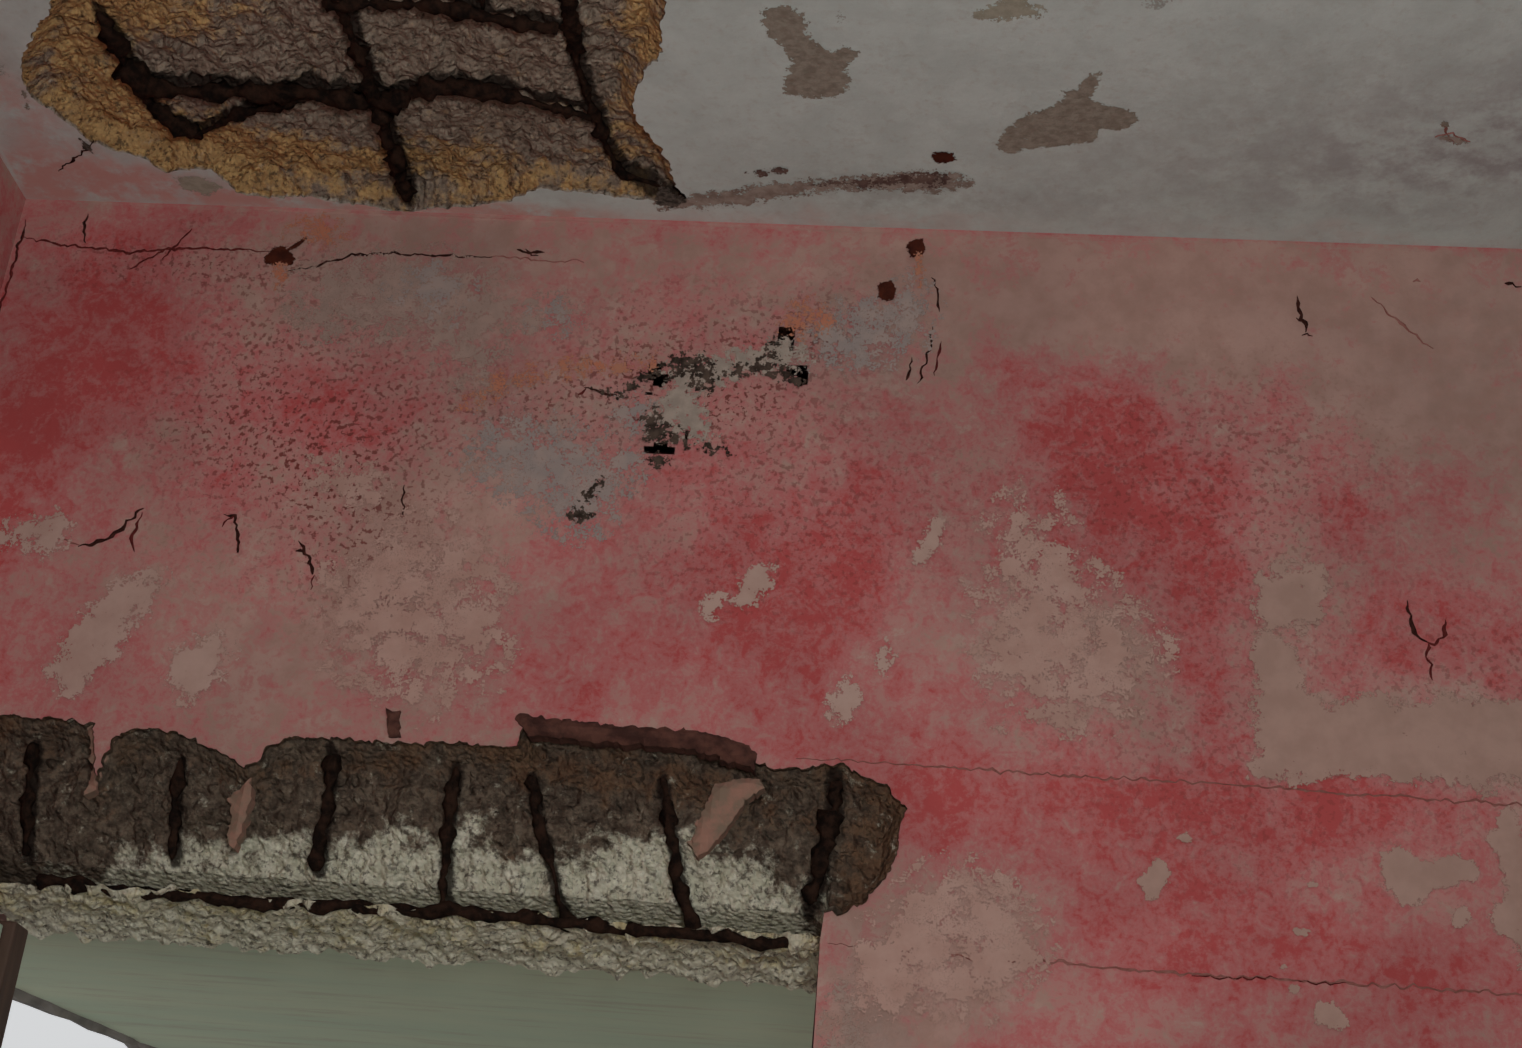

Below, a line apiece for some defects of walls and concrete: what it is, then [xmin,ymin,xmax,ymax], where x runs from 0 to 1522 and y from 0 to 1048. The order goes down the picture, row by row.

peeling [759,5,861,99]
spalling [20,0,686,212]
peeling [996,71,1139,154]
leakage [652,167,975,212]
crack [0,215,584,310]
rust [877,280,896,301]
rust [906,239,927,289]
peeling [590,335,819,470]
crack [58,508,144,552]
crack [222,514,240,553]
crack [1405,600,1448,680]
spalling [0,447,1064,1048]